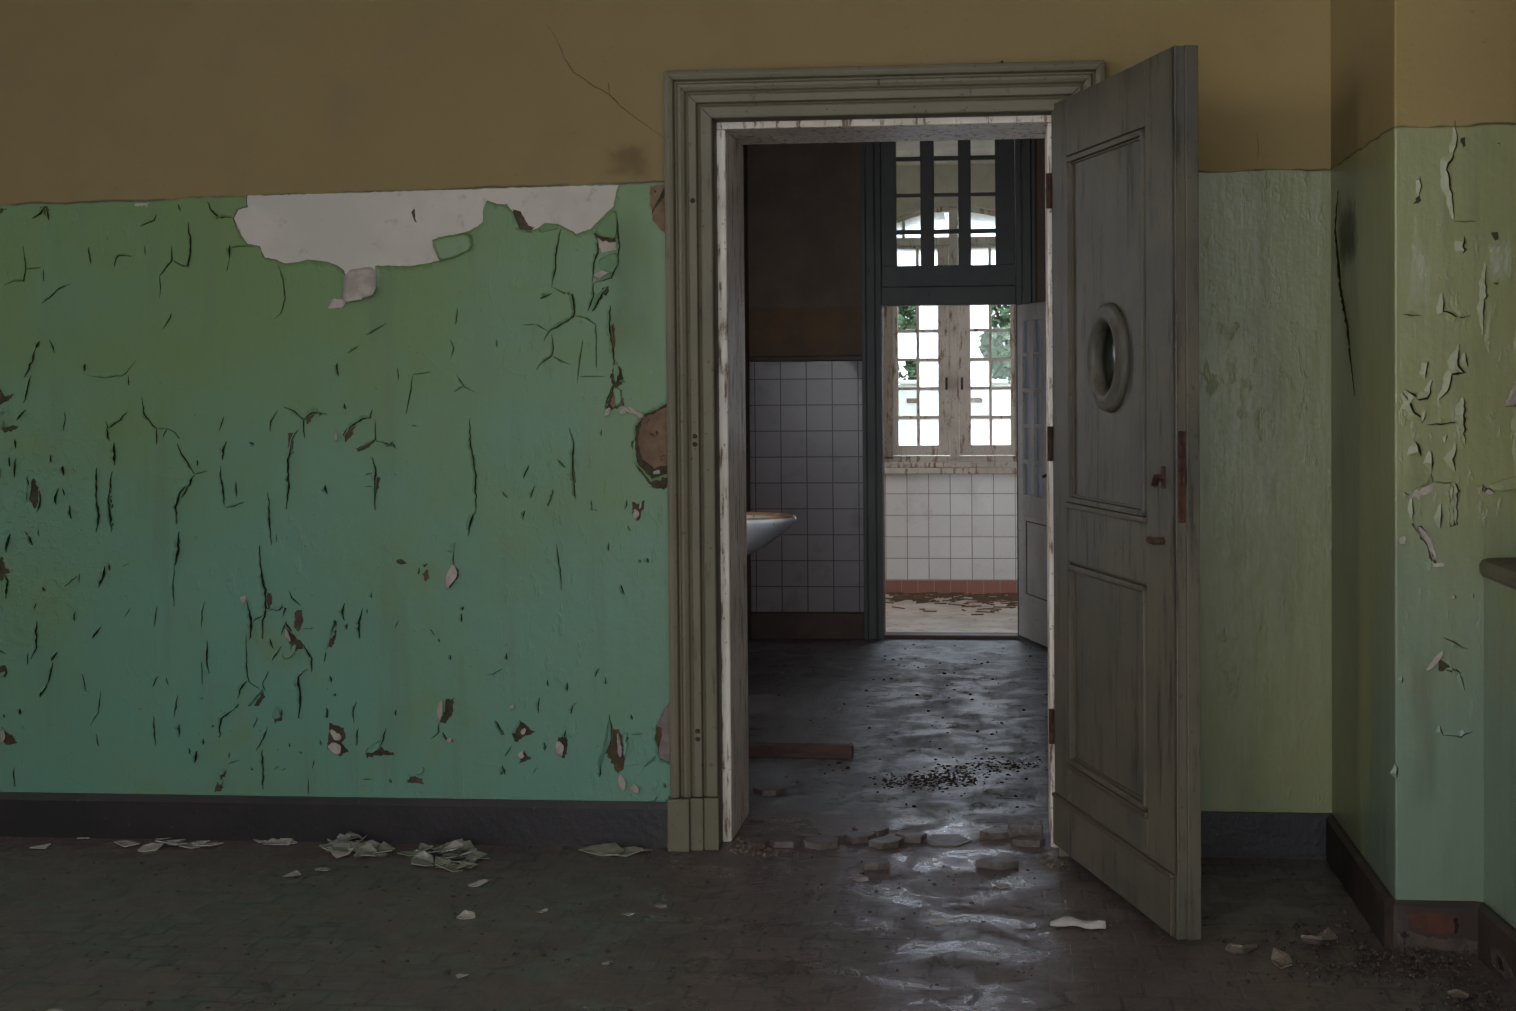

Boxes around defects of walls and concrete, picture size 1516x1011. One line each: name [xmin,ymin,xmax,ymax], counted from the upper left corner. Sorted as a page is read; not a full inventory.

peeling [0,389,42,599]
crack [4,202,286,328]
crack [16,339,337,794]
peeling [240,545,348,728]
crack [354,593,464,661]
peeling [231,184,668,531]
crack [397,308,610,551]
crack [495,229,605,383]
crack [1334,191,1355,397]
peeling [319,701,424,784]
peeling [494,705,568,775]
peeling [597,698,670,793]